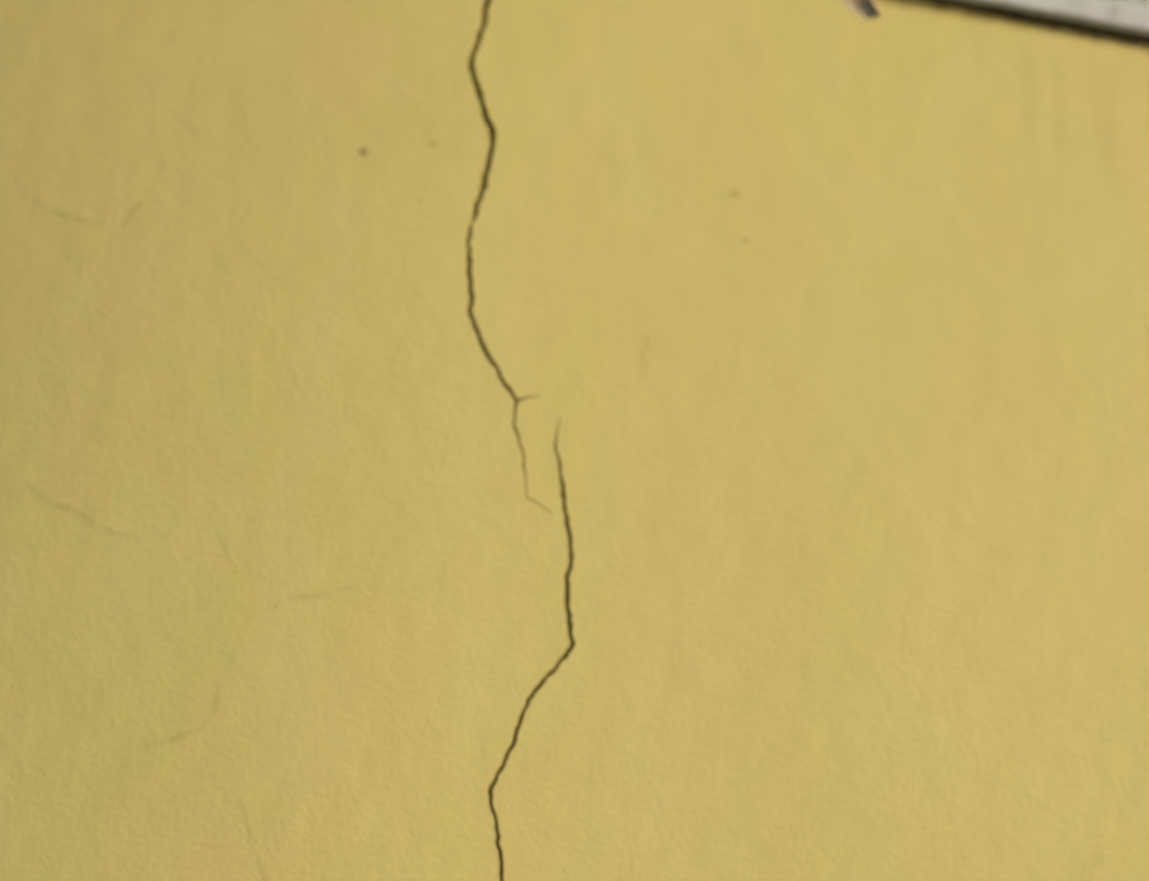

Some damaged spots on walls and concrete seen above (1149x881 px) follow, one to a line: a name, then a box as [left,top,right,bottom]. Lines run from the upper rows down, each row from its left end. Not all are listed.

crack [465,0,576,881]